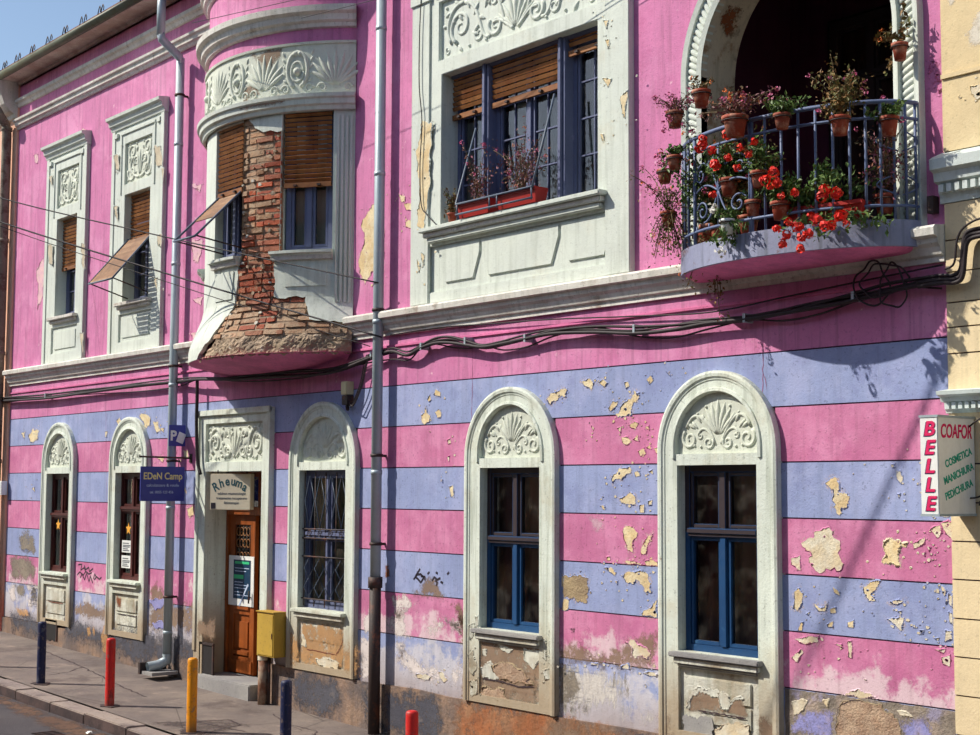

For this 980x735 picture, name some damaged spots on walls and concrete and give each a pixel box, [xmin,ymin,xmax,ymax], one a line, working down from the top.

peeling [386,120,435,232]
spalling [200,114,352,363]
peeling [357,204,385,287]
peeling [561,365,662,618]
peeling [783,516,955,675]
spalling [300,624,343,669]
peeling [360,614,369,678]
spalling [467,615,559,703]
leakage [547,634,658,735]
spalling [682,685,750,735]
leakage [758,717,772,735]
spalling [785,678,956,735]